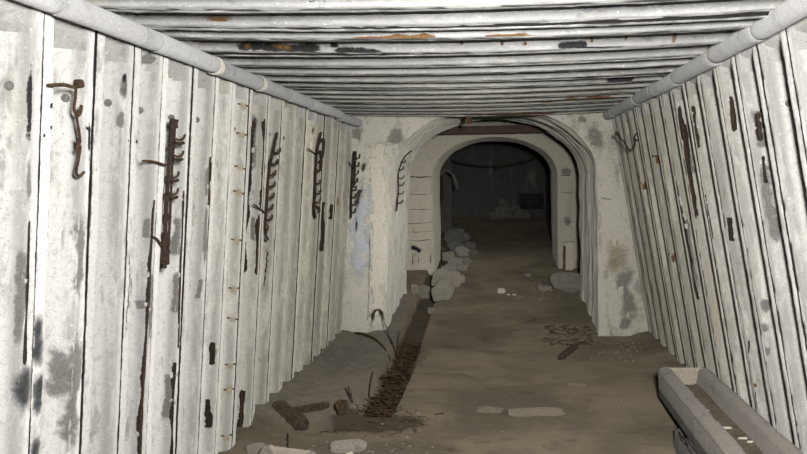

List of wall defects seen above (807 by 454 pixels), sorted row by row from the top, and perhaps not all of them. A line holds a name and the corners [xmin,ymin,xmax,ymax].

damp [74,224,85,290]
damp [617,271,634,328]
damp [45,343,83,444]